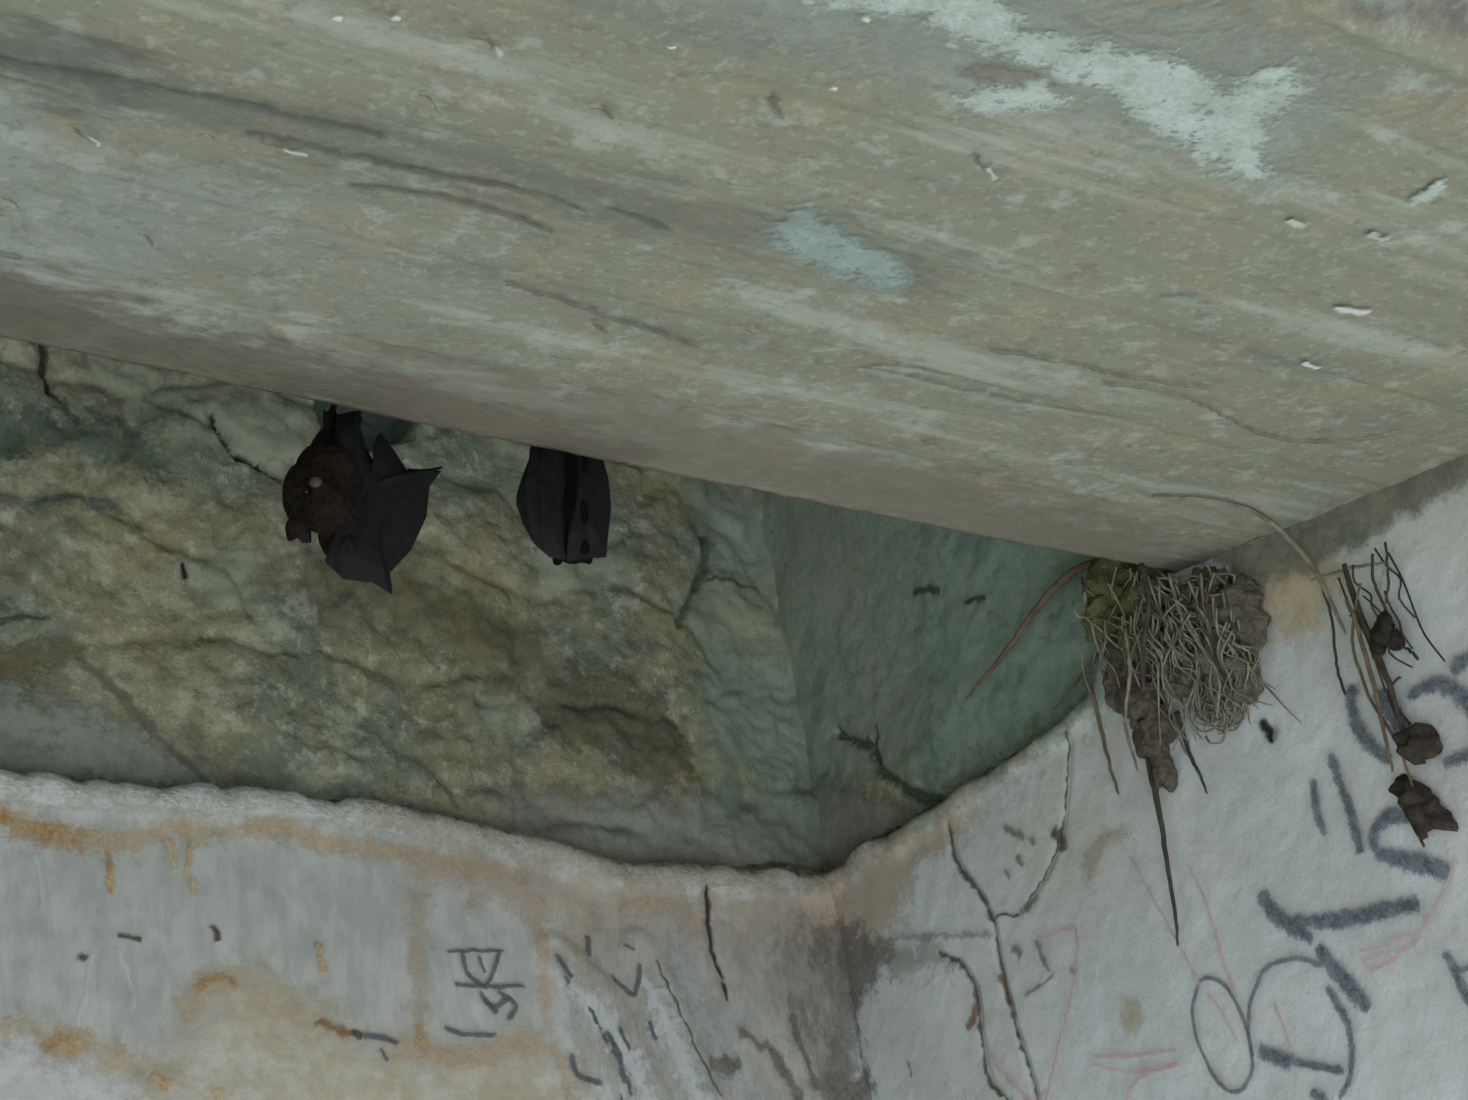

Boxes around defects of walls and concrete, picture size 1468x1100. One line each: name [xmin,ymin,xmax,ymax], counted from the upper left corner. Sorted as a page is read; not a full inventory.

crack [39,345,80,420]